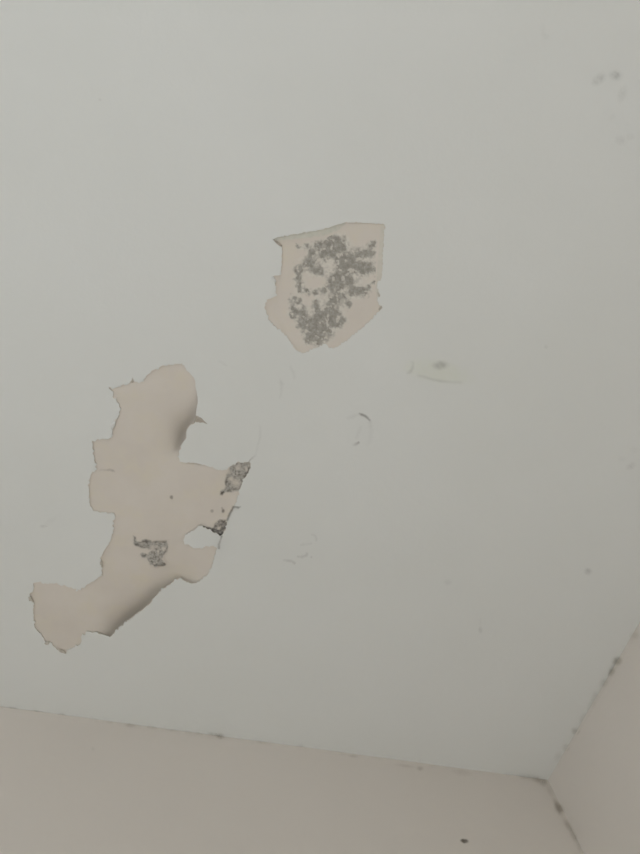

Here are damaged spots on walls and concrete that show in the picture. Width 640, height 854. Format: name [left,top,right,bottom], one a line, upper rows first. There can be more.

peeling [264,222,385,353]
peeling [28,364,251,654]